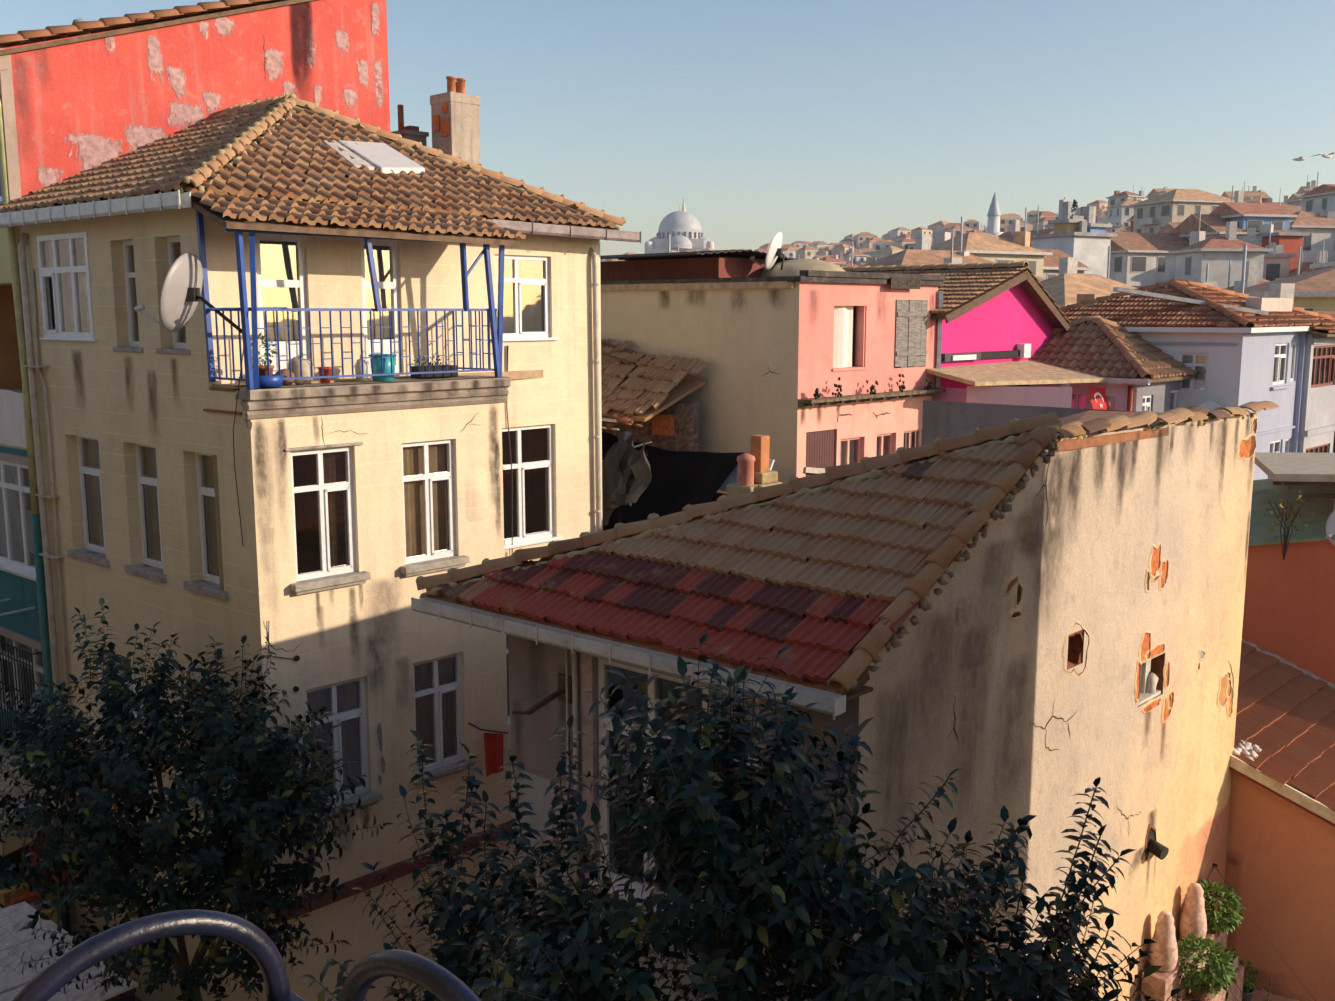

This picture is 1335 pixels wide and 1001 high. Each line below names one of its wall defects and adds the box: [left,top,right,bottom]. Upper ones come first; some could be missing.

peeling [199,16,236,40]
peeling [370,2,380,36]
peeling [37,35,224,187]
peeling [263,48,297,96]
peeling [314,85,322,104]
peeling [335,29,384,111]
water stain [1097,440,1138,488]
water stain [1037,449,1081,540]
spalling [1144,541,1169,593]
spalling [1003,573,1024,622]
spalling [1134,629,1174,725]
crack [1029,700,1078,751]